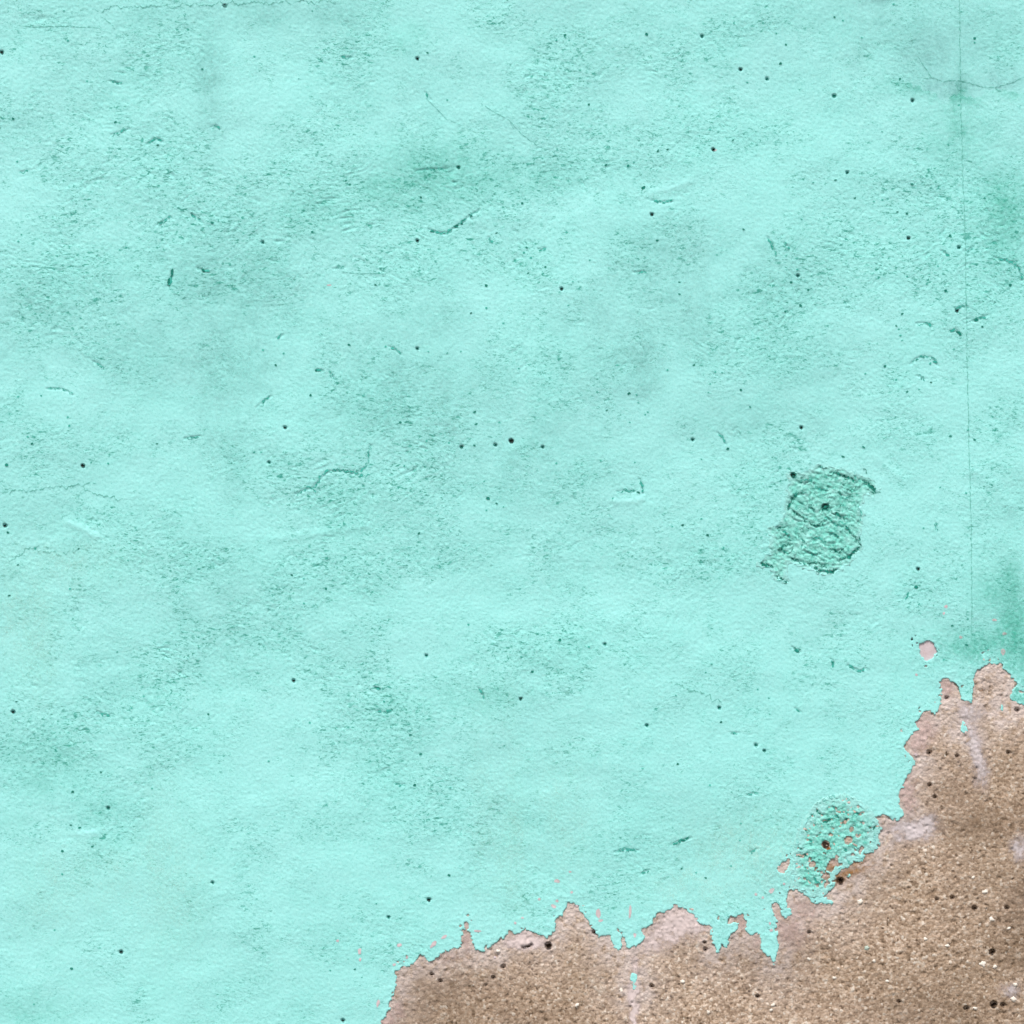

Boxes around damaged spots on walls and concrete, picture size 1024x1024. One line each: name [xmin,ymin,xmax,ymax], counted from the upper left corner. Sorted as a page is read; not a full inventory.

peeling [376,649,1024,1024]
peeling [915,640,945,676]